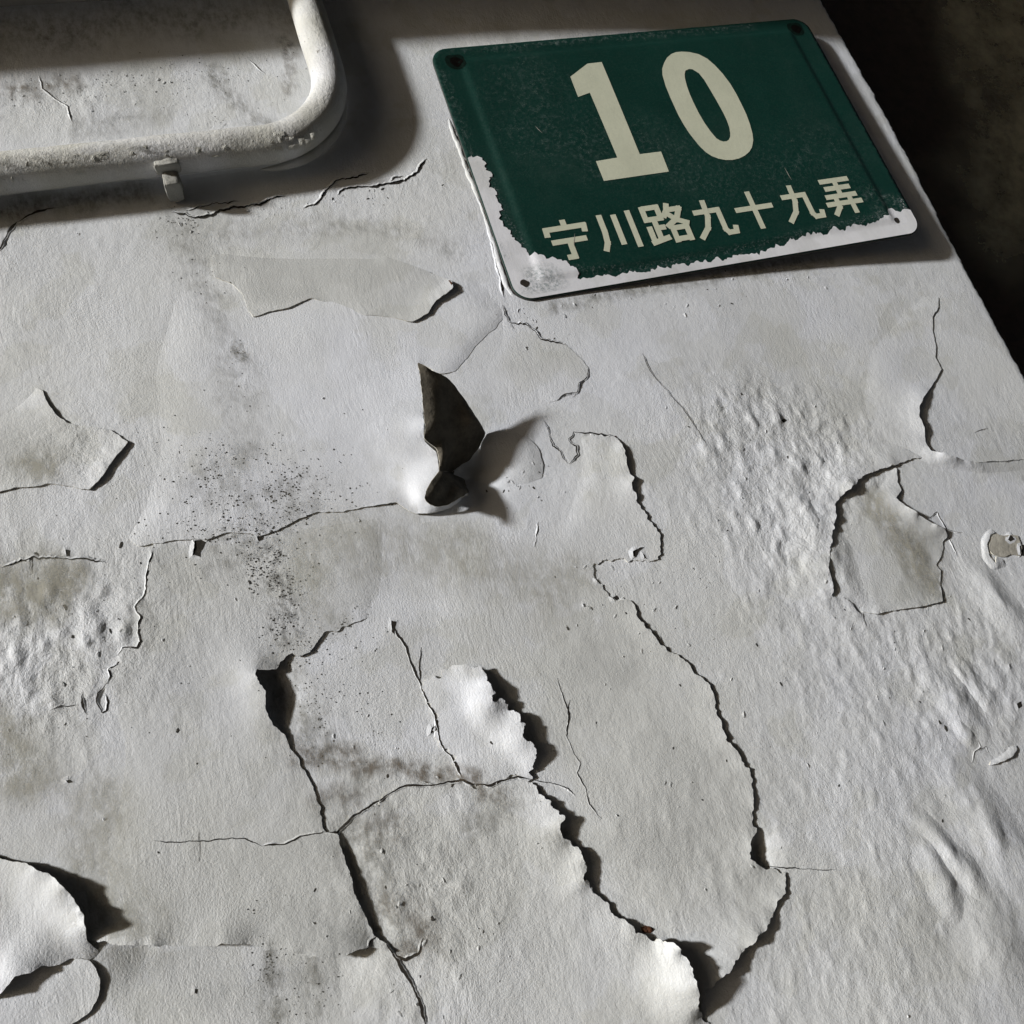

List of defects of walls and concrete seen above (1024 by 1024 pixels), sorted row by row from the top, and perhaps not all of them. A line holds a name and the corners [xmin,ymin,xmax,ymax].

crack [0,207,59,251]
crack [171,158,427,219]
peeling [782,297,1024,633]
crack [979,457,1023,465]
crack [0,554,106,575]
peeling [0,247,786,1024]
crack [161,626,601,861]
crack [365,934,428,1024]